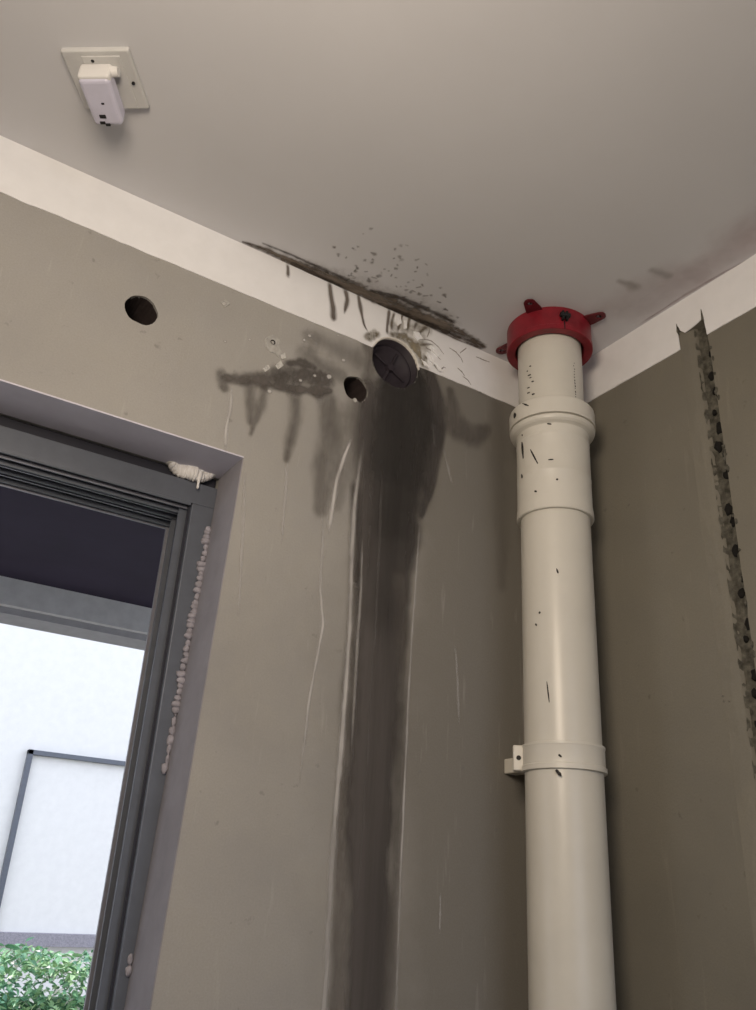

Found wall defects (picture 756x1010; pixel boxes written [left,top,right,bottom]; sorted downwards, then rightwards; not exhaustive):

damp [242,241,486,349]
damp [220,358,332,445]
damp [302,344,488,1010]